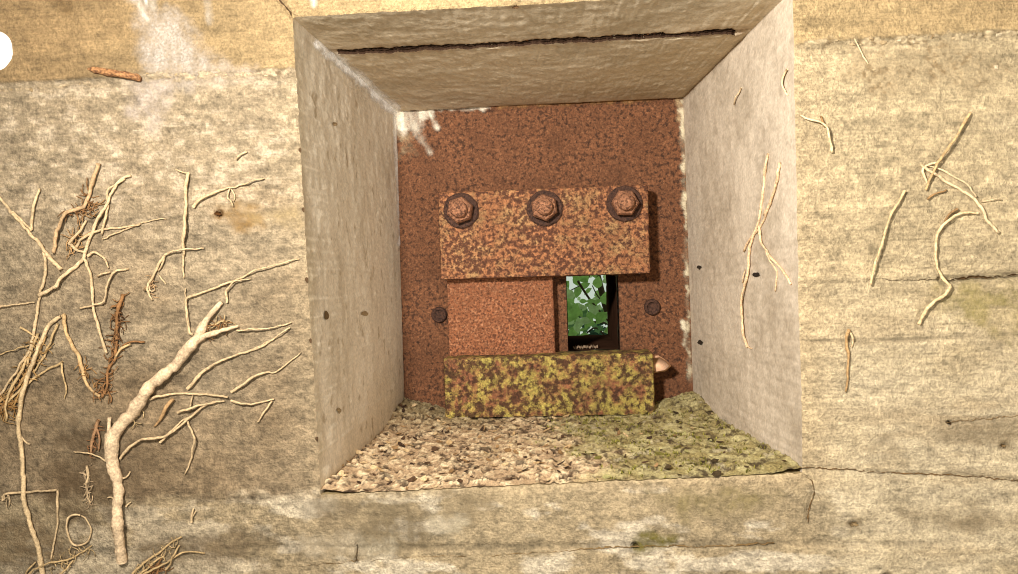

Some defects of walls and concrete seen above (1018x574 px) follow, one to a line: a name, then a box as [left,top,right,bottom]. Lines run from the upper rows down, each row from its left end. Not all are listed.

water stain [138,0,206,73]
crack [337,28,736,54]
water stain [314,41,453,224]
crack [874,273,1018,281]
crack [800,467,1018,521]